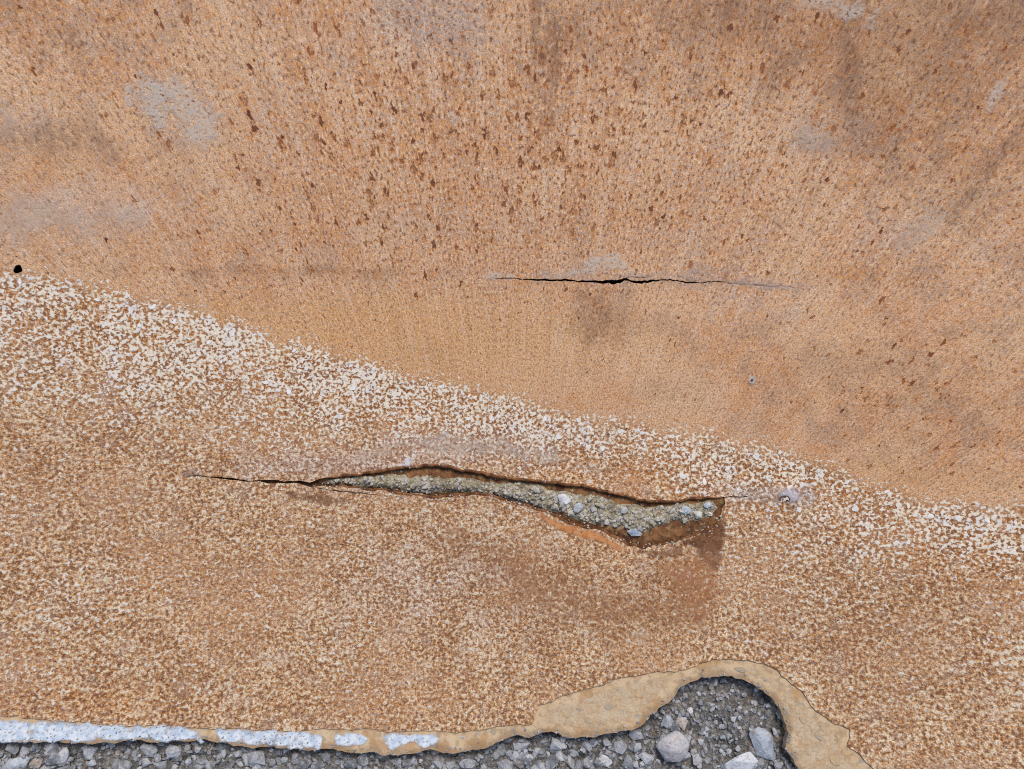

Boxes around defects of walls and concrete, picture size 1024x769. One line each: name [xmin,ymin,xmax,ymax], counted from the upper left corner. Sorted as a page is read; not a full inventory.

crack [492,276,794,288]
peeling [0,263,1024,743]
spalling [735,667,855,769]
peeling [216,728,322,750]
peeling [335,733,367,746]
peeling [384,733,439,750]